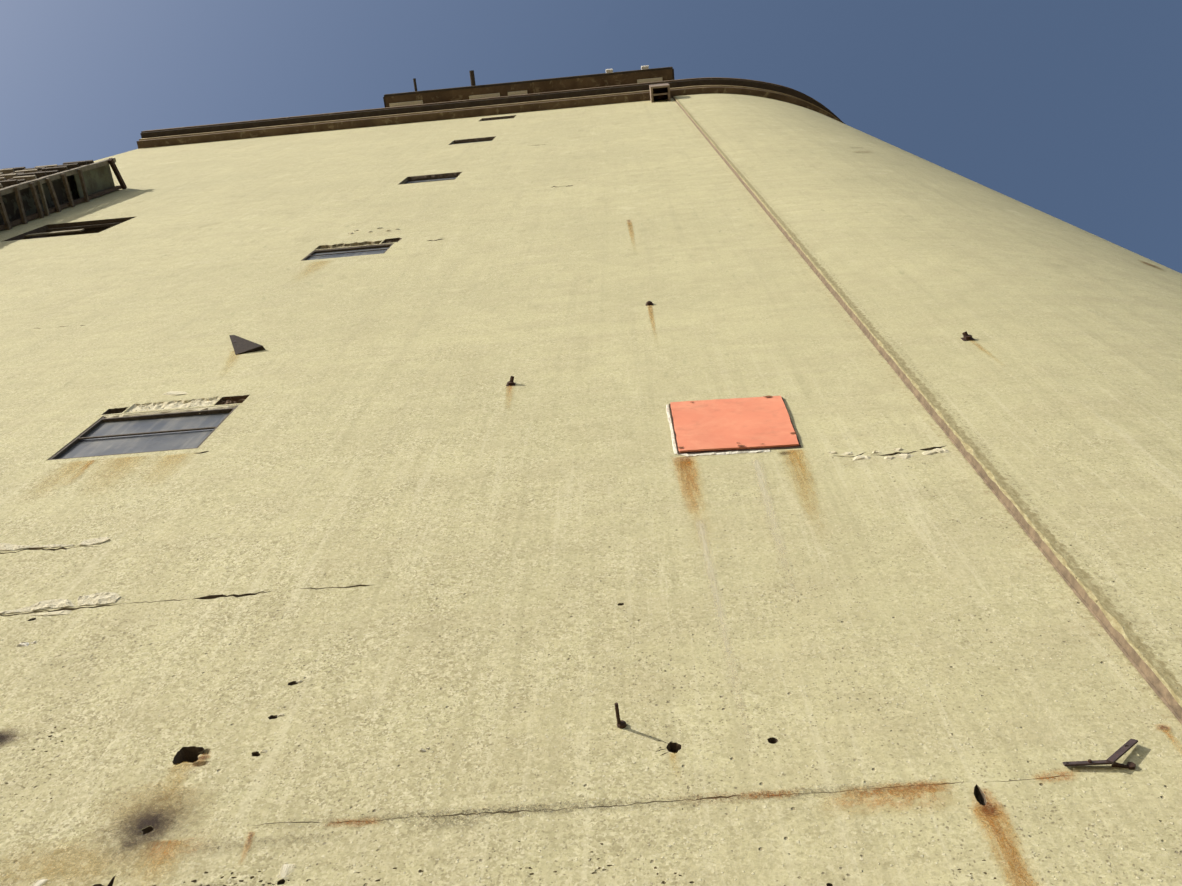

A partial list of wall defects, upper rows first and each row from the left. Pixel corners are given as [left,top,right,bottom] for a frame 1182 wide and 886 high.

crack [828,446,949,461]
crack [301,583,370,591]
spalling [0,592,121,621]
crack [0,590,273,616]
spalling [172,746,211,767]
crack [254,782,960,826]